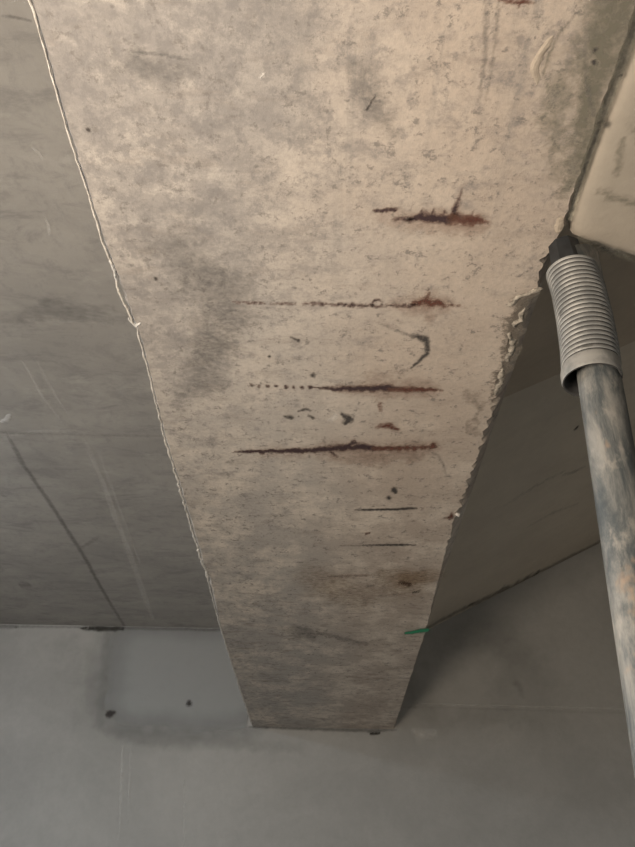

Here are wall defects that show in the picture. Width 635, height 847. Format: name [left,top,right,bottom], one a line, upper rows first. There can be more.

corrosion [373,194,486,227]
corrosion [305,294,453,309]
corrosion [251,384,437,392]
corrosion [237,440,437,458]